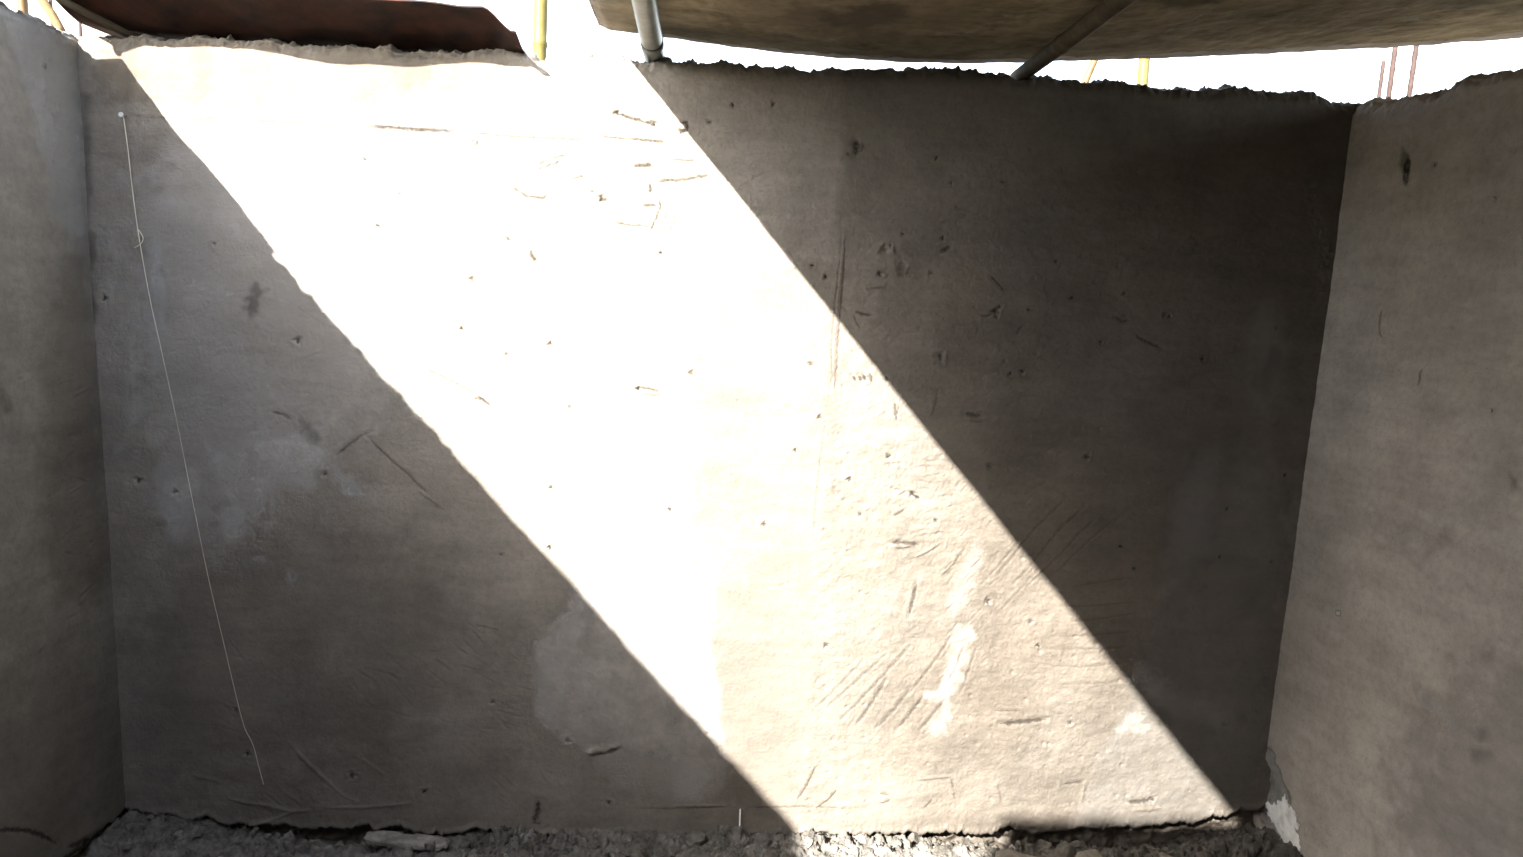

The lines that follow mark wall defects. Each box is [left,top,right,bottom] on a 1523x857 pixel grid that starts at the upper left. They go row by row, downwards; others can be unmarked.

leakage [533,402,723,762]